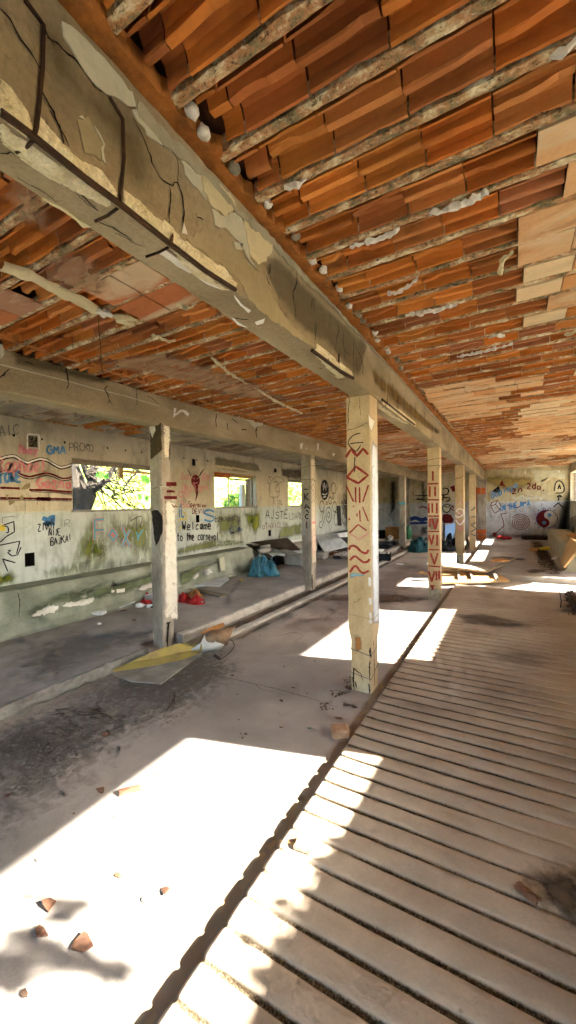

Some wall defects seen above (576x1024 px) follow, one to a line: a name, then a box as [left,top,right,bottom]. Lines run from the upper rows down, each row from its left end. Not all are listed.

crack [1,9,109,146]
crack [0,151,178,257]
crack [133,118,203,223]
spalling [0,0,457,440]
water stain [269,262,366,371]